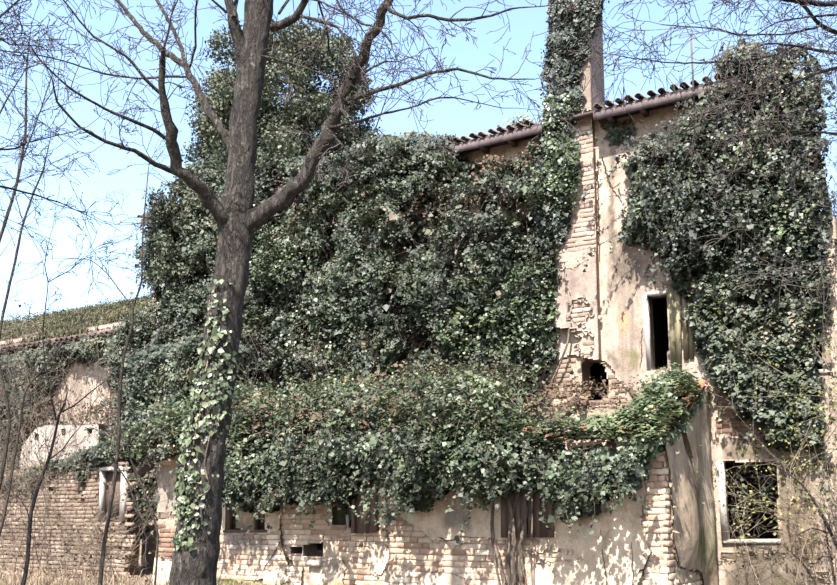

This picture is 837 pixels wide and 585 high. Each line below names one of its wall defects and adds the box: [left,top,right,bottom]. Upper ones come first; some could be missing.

spalling [554,107,600,271]
spalling [546,295,602,408]
spalling [586,371,627,409]
crack [218,523,304,585]
spalling [216,504,583,585]
spalling [638,451,703,585]